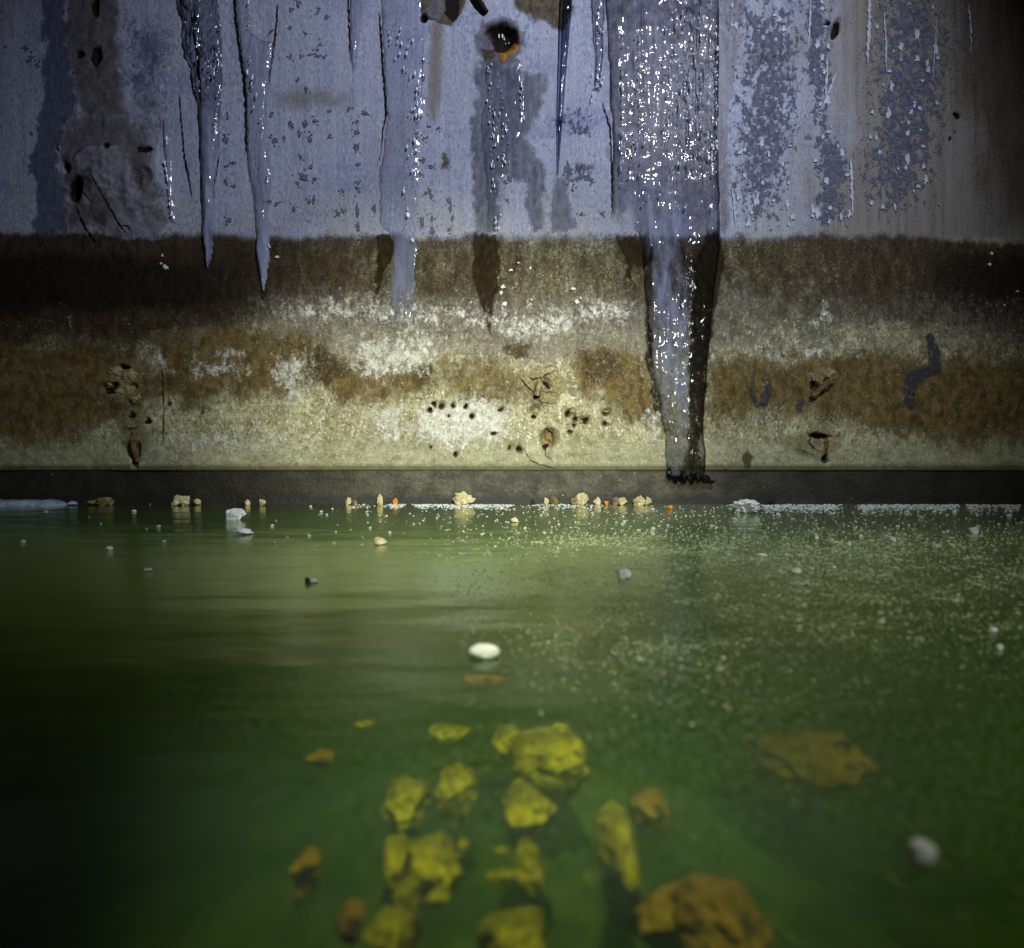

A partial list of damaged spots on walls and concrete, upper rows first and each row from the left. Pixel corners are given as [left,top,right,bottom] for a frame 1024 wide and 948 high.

peeling [693,0,972,231]
crack [55,139,132,246]
damp [0,0,1024,484]
spalling [105,363,151,464]
spalling [427,402,474,419]
spalling [786,427,844,462]
corrosion [707,349,1024,446]